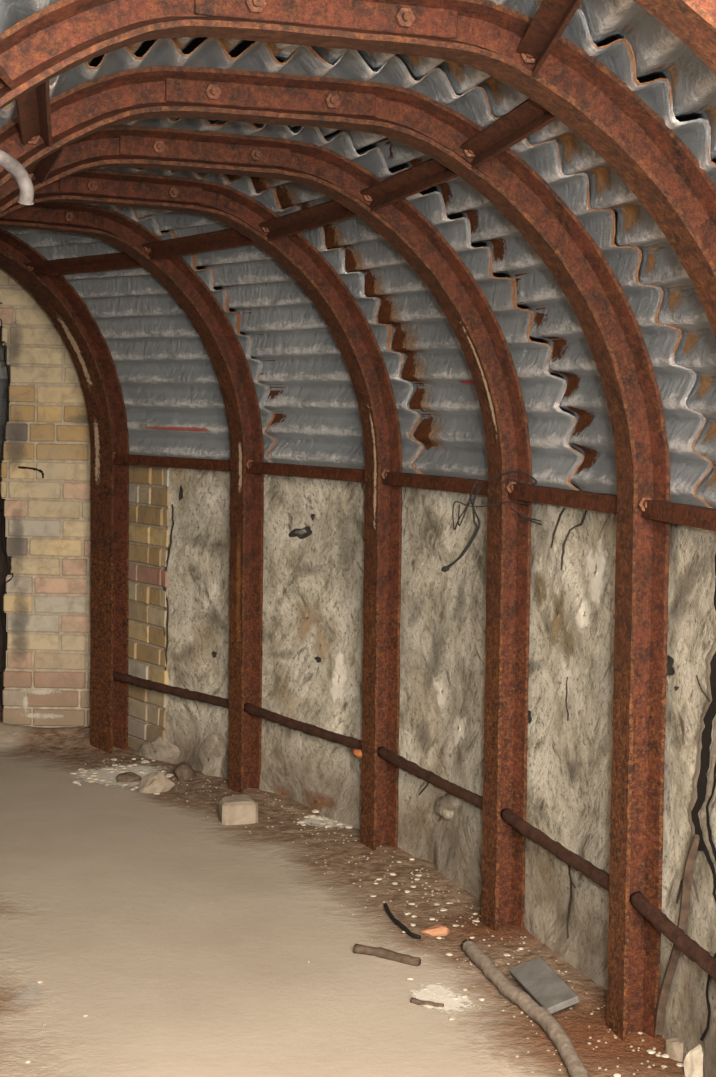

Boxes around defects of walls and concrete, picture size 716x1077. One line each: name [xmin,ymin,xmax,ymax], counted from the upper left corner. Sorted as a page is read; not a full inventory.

rust [379,138,422,167]
rust [542,133,578,162]
rust [226,174,310,209]
rust [324,225,439,450]
rust [436,183,599,475]
rust [260,360,287,425]
crack [687,533,716,902]
crack [675,879,683,904]
crack [700,953,716,1041]